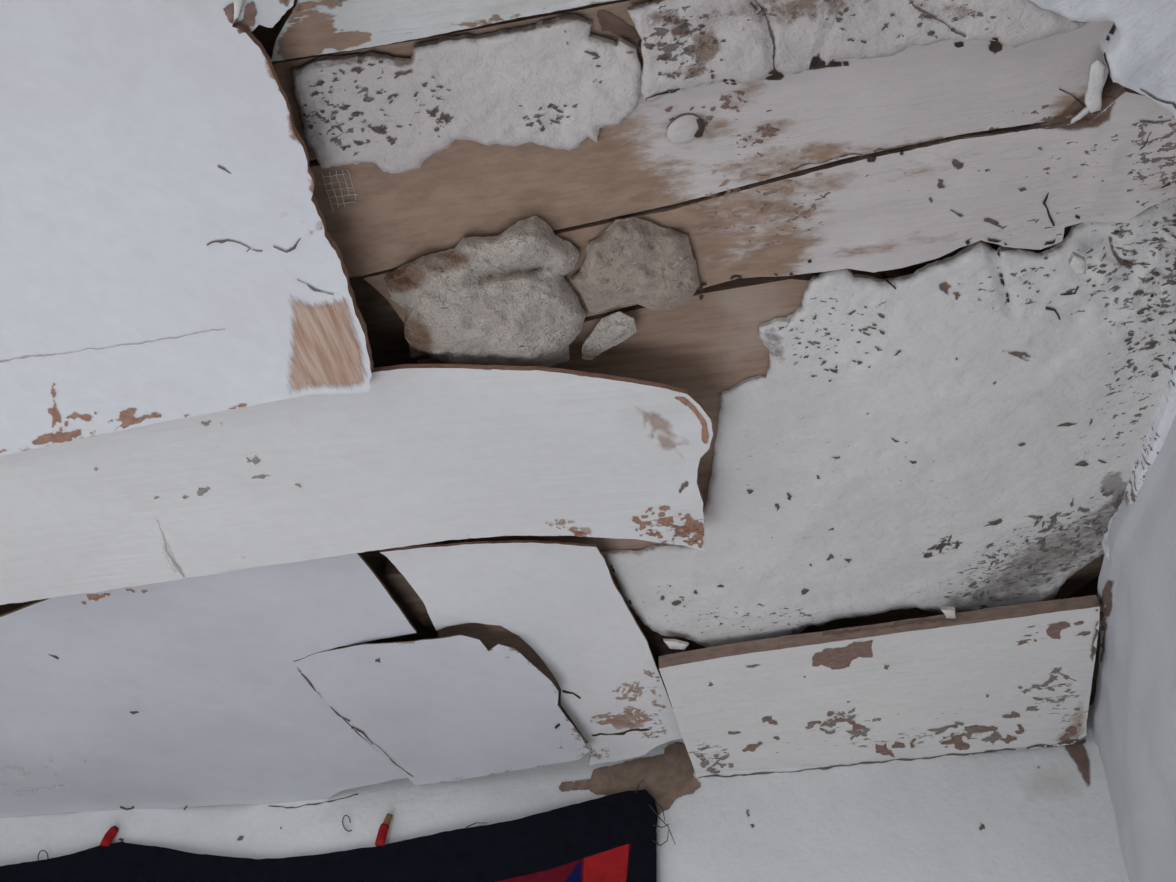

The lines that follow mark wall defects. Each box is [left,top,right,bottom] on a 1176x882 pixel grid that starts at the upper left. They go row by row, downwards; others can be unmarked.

spalling [303,60,403,151]
spalling [809,57,849,70]
flaking render [1070,58,1106,124]
spalling [1066,206,1176,378]
peeling [290,300,363,391]
peeling [32,383,97,445]
peeling [110,408,162,429]
peeling [632,506,704,548]
peeling [804,606,956,678]
crack [301,673,413,777]
peeling [805,701,916,757]
peeling [928,667,1081,751]